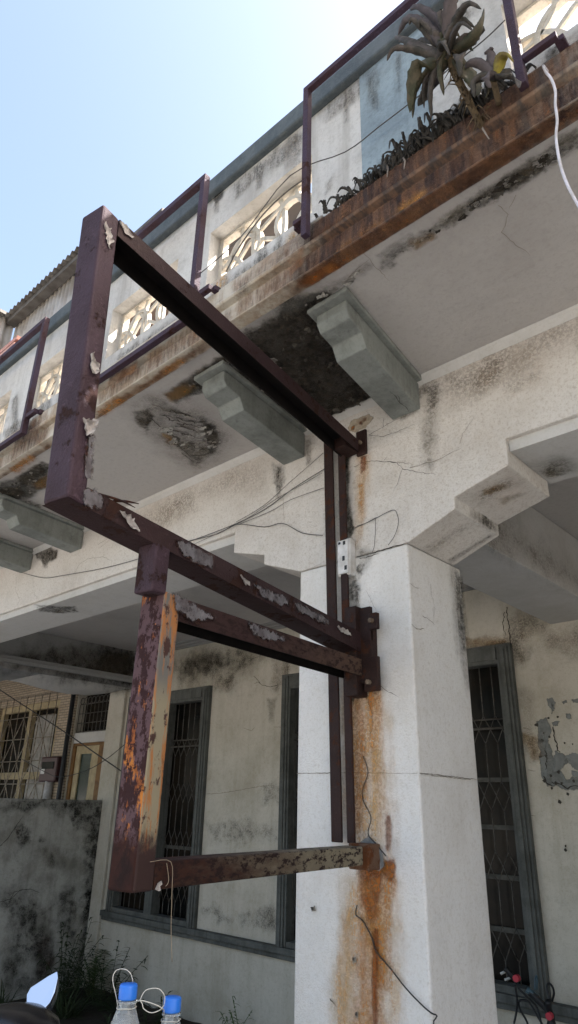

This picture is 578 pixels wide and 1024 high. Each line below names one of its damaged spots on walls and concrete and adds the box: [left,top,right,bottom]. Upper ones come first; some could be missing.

rust [297,41,578,289]
peeling [136,357,290,464]
crack [354,396,473,486]
damp [178,651,252,683]
flaking render [534,697,578,804]
damp [8,798,99,874]
rust [336,691,395,1024]
damp [3,893,54,989]
damp [60,891,92,936]